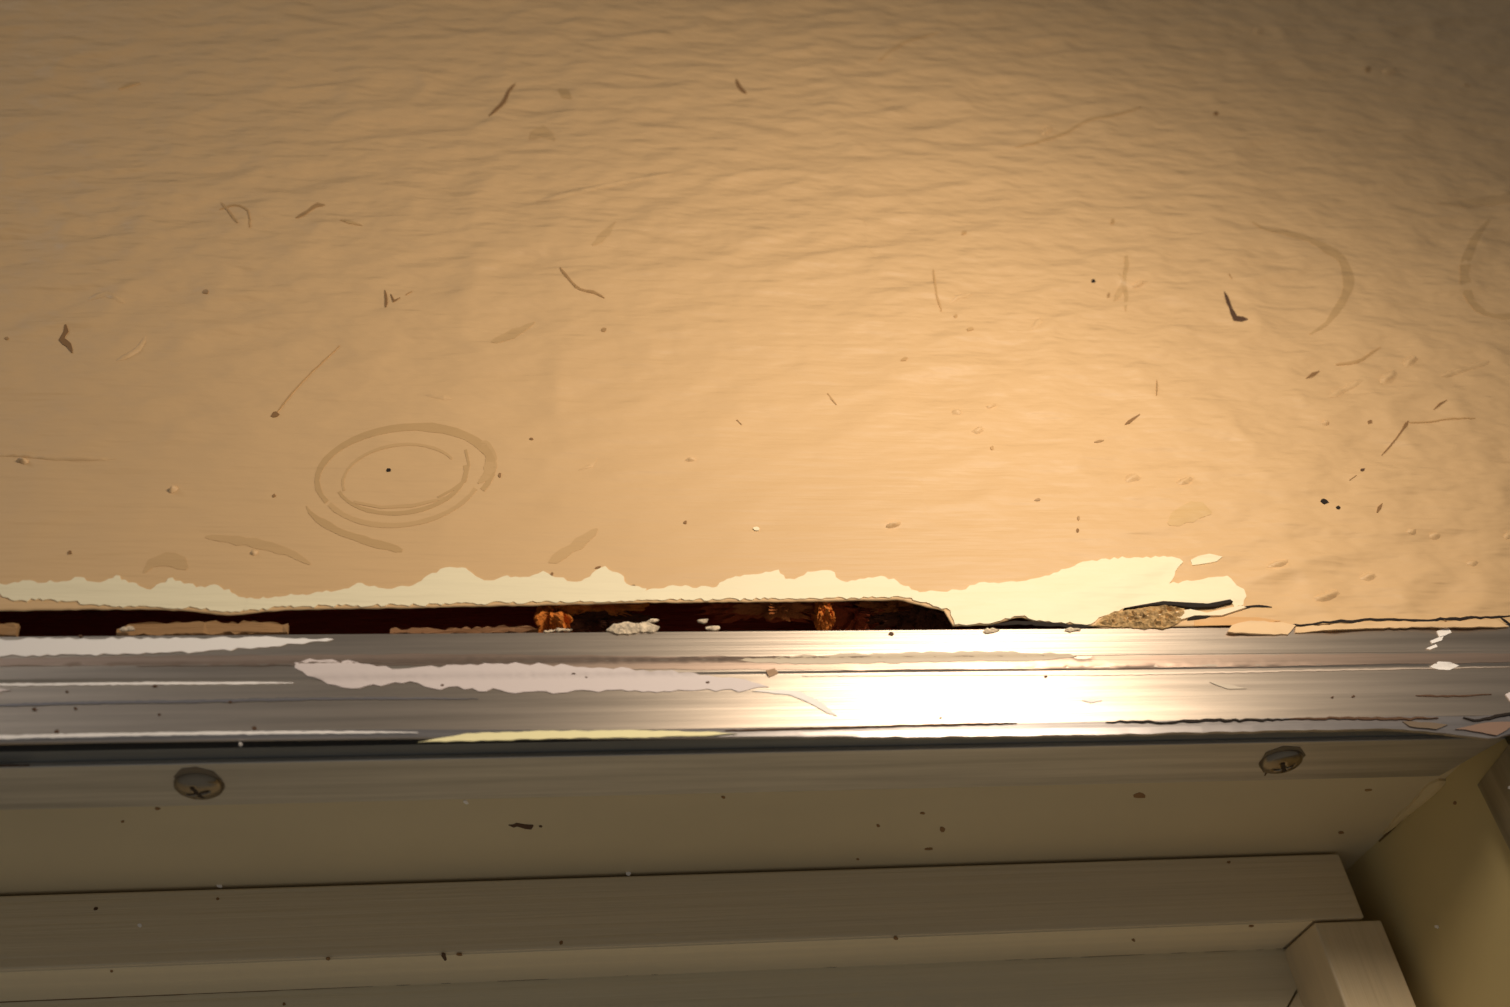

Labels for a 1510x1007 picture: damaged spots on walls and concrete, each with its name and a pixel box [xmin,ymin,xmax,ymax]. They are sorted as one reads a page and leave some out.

peeling [0,554,1509,636]